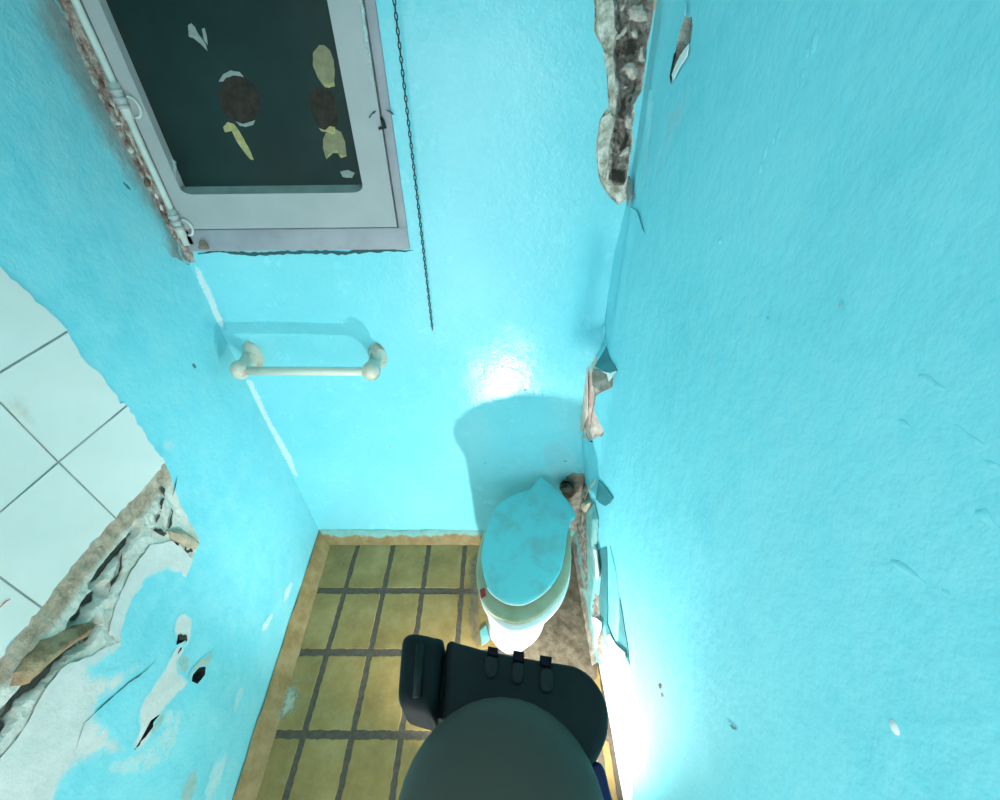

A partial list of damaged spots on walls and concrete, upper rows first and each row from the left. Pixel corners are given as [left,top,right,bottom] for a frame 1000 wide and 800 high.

spalling [0,463,213,800]